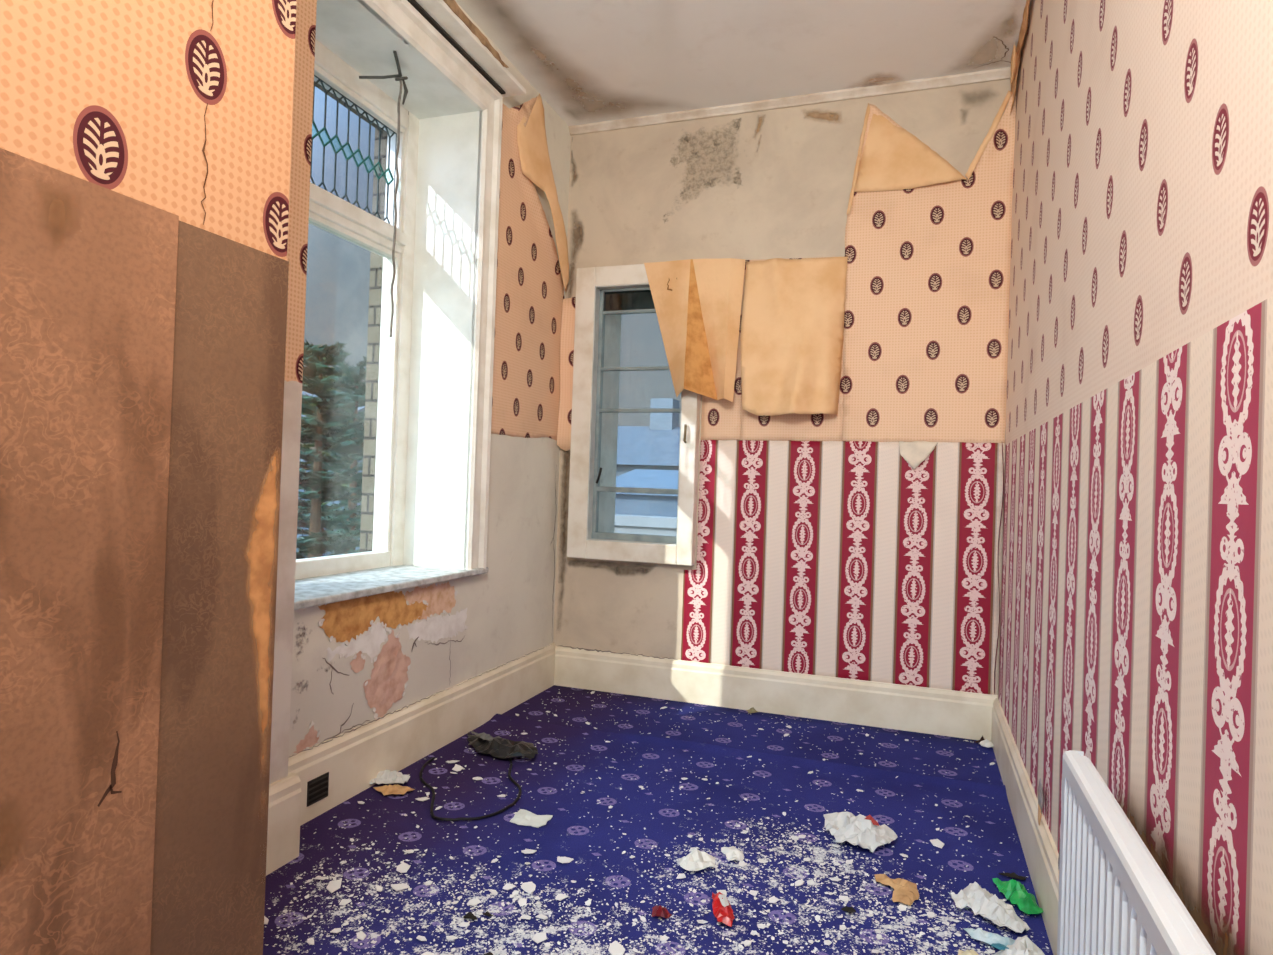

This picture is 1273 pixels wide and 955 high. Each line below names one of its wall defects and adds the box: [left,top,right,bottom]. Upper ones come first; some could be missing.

crack [200,103,208,225]
spalling [318,581,468,720]
crack [98,731,122,807]